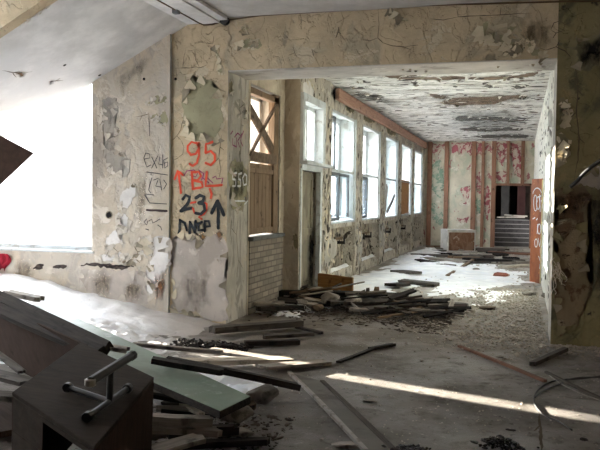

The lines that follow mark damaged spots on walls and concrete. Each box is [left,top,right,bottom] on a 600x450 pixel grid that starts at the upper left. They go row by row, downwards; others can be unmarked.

peeling [100,97,131,178]
peeling [78,182,229,322]
peeling [180,73,250,146]
peeling [321,172,343,274]
flaking render [335,20,600,337]